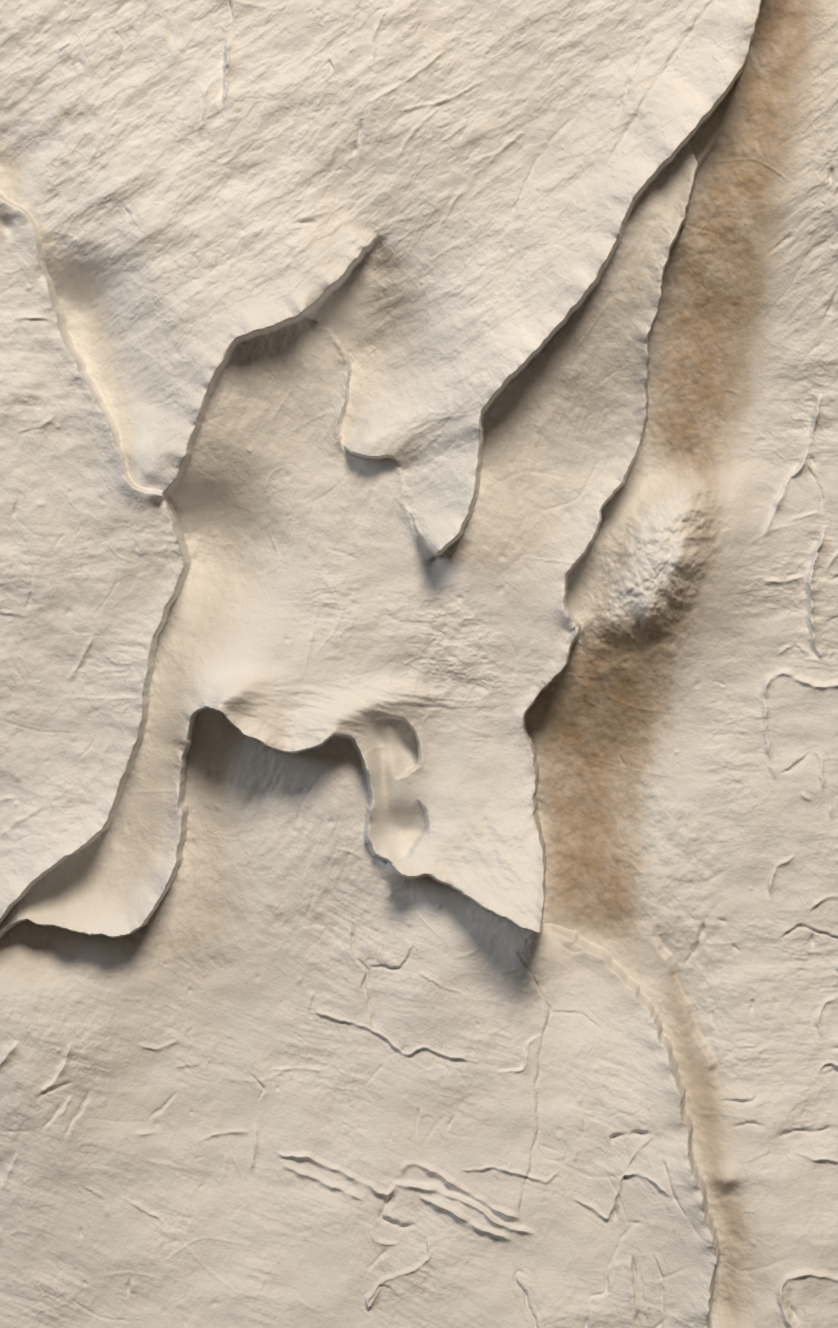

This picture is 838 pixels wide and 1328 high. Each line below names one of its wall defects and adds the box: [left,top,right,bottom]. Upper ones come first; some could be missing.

spalling [0,0,763,976]
crack [486,943,612,1216]
crack [710,1081,838,1145]
crack [508,1264,545,1328]
crack [565,1148,696,1328]